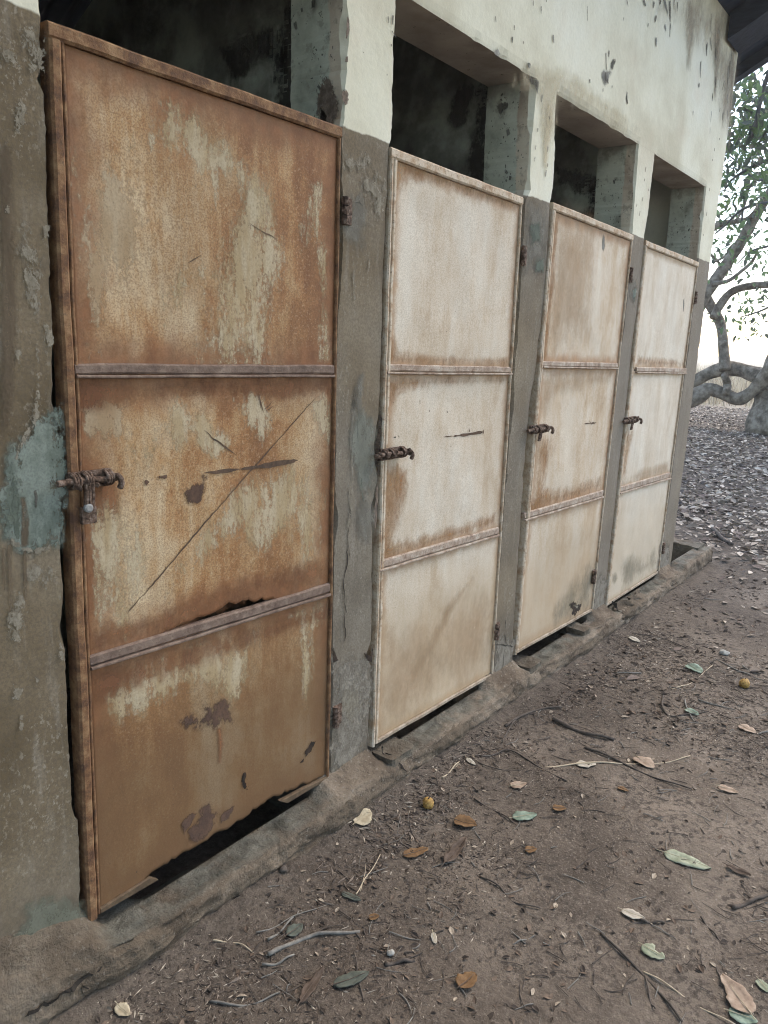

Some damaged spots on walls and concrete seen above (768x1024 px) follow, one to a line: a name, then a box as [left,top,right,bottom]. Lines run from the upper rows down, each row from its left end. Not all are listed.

peeling [0,26,46,85]
damp [273,0,348,108]
damp [589,51,615,83]
damp [643,0,734,120]
peeling [0,221,69,589]
rust [81,378,134,409]
rust [184,475,207,503]
crack [343,509,351,641]
peeling [7,591,28,648]
rust [96,608,325,695]
rust [180,699,233,759]
rust [182,804,234,842]